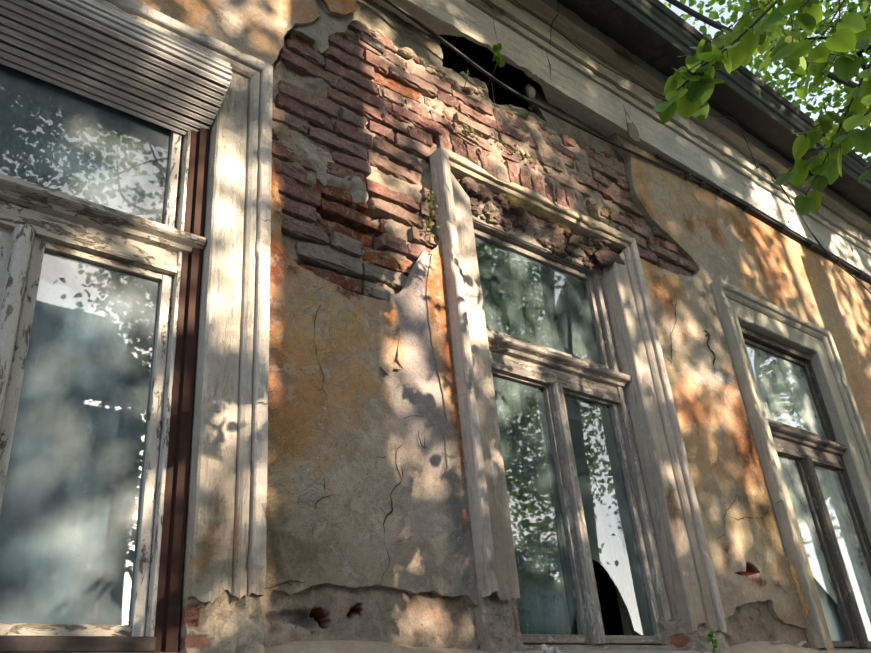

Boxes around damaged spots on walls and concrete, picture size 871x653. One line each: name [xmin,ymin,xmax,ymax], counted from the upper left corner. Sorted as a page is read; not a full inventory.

flaking render [272,0,697,480]
crack [377,415,449,578]
flaking render [179,584,527,653]
flaking render [659,601,811,653]